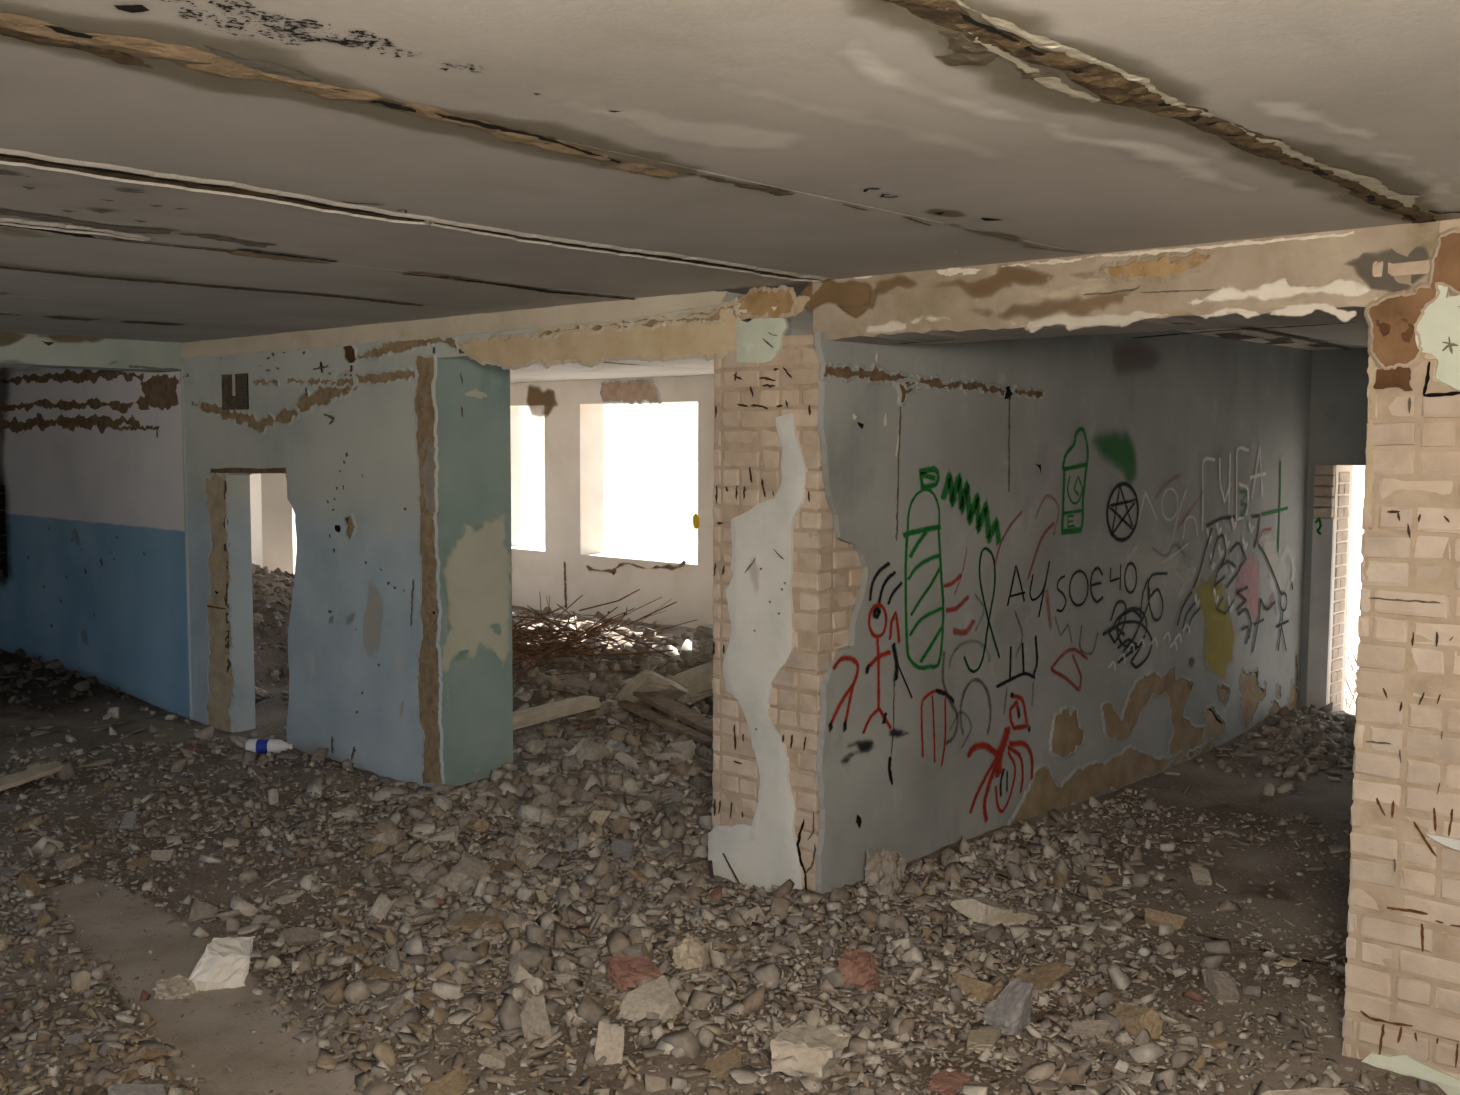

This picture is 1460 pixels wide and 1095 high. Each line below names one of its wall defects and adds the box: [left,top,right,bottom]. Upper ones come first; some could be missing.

crack [882,0,1460,223]
peeling [0,189,277,248]
crack [0,218,636,306]
crack [0,148,828,282]
spalling [937,268,981,276]
spalling [1002,231,1354,296]
peeling [1192,329,1330,347]
spalling [1363,227,1460,534]
spalling [0,285,810,787]
peeling [1007,654,1299,826]